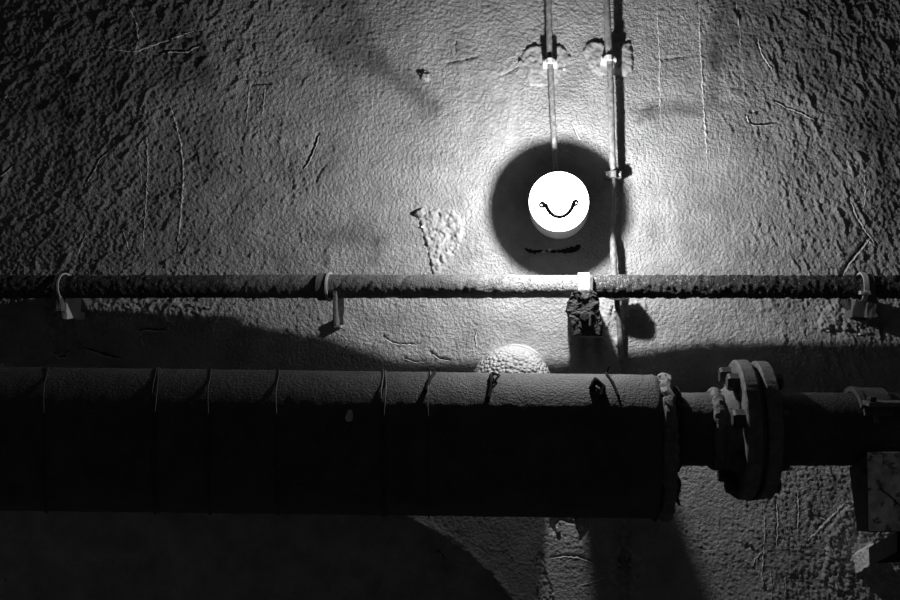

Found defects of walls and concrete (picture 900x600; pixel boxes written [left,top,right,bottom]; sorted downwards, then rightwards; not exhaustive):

crack [100,8,198,54]
crack [736,2,773,71]
crack [641,2,708,170]
crack [746,101,816,126]
crack [122,134,149,254]
crack [145,95,198,250]
crack [303,135,326,182]
peeling [414,207,464,275]